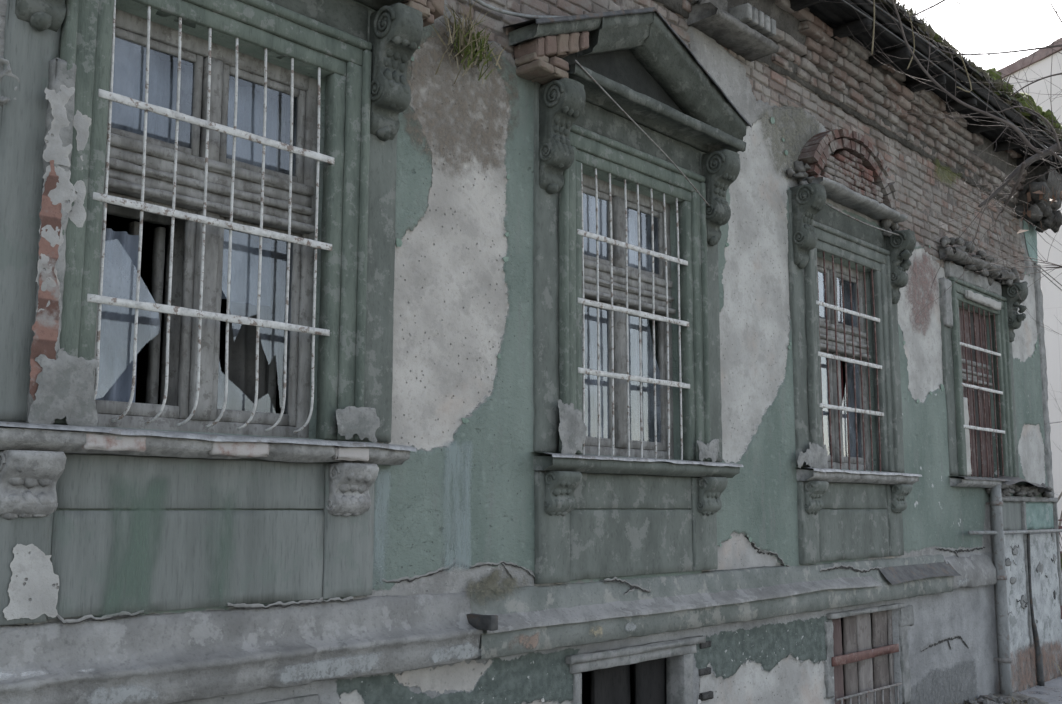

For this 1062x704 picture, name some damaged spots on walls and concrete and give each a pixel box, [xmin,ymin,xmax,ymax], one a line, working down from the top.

spalling [28,85,146,452]
spalling [332,0,690,461]
spalling [697,42,1038,463]
spalling [1018,424,1046,485]
spalling [3,544,59,620]
peeling [280,654,379,682]
spalling [339,690,364,704]
spalling [395,643,492,694]
spalling [697,620,835,704]